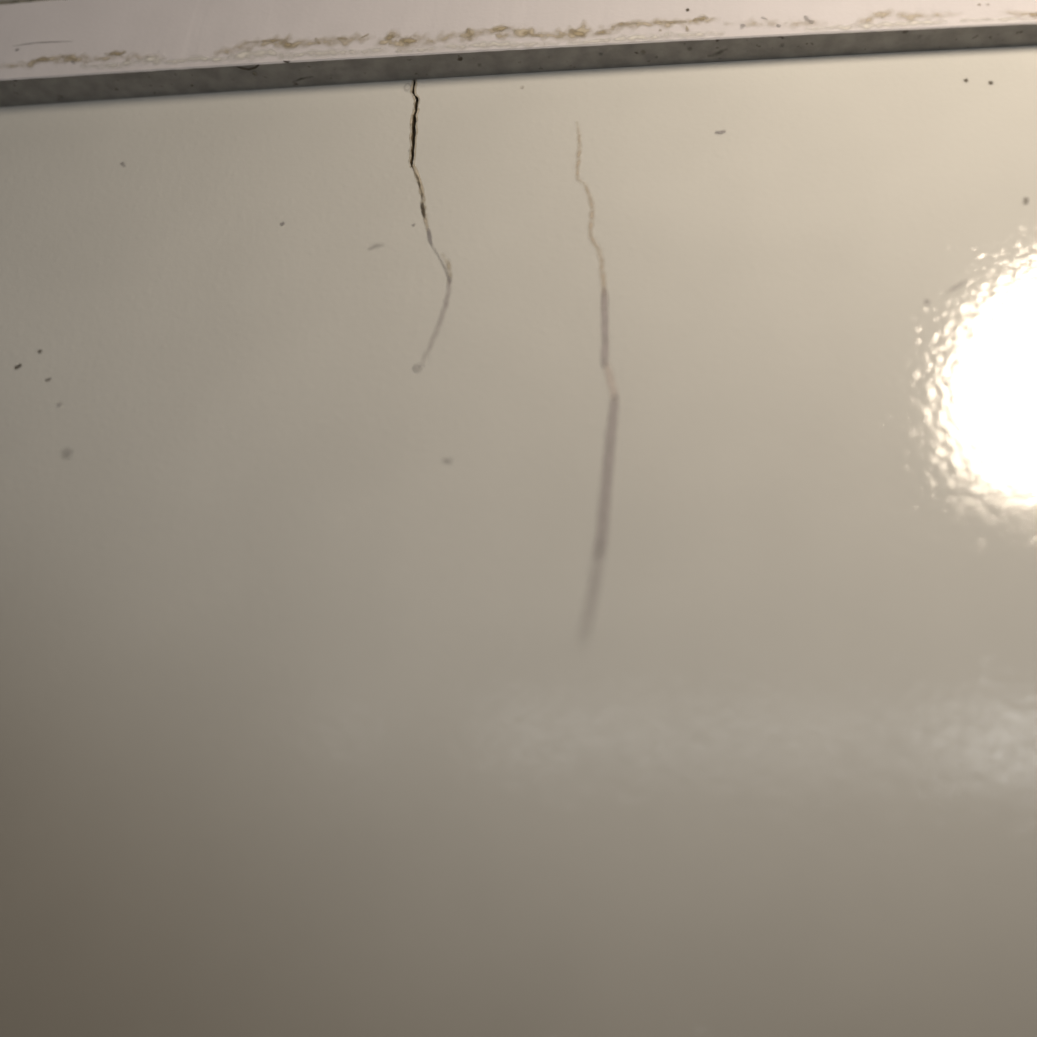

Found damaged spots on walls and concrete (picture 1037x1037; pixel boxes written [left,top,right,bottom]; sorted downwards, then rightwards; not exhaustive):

crack [409,79,432,245]
crack [577,140,617,542]